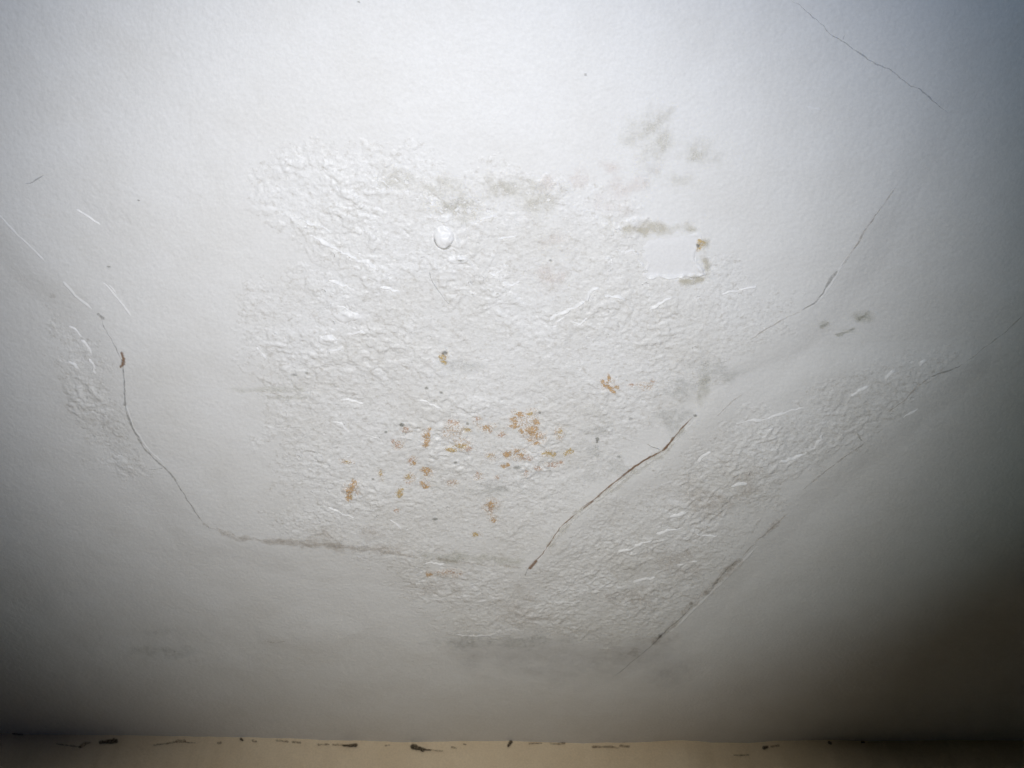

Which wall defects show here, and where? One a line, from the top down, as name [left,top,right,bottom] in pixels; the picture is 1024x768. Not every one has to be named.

rust [446,412,574,474]
peeling [243,151,831,660]
crack [529,421,694,569]